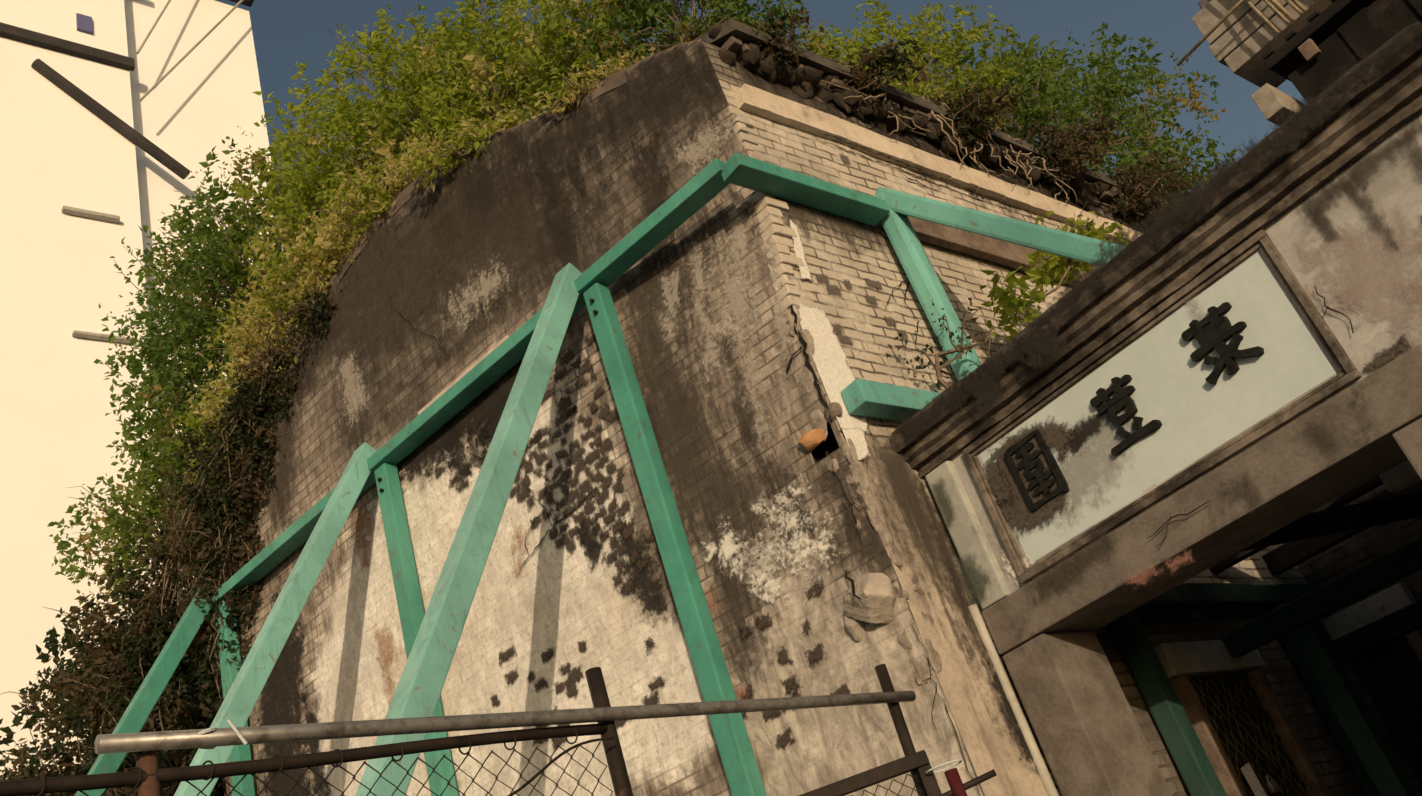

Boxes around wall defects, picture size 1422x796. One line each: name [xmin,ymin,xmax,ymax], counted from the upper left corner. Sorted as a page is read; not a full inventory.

water stain [1304,117,1422,249]
water stain [269,43,721,529]
peeling [659,218,918,601]
water stain [618,50,1386,772]
water stain [576,513,668,627]
peeling [701,476,835,640]
spalling [738,619,827,749]
spalling [830,684,851,695]
spalling [897,611,942,685]